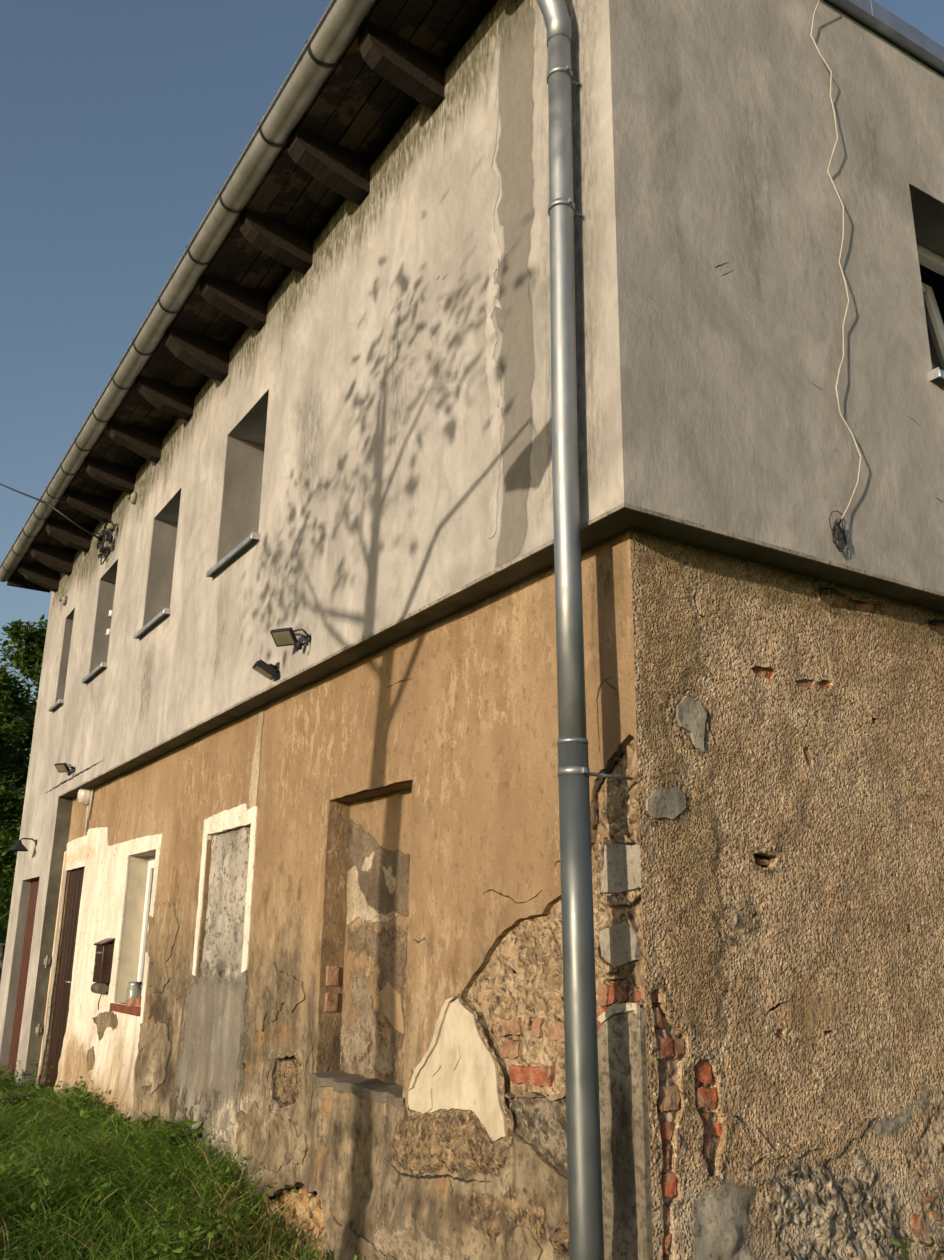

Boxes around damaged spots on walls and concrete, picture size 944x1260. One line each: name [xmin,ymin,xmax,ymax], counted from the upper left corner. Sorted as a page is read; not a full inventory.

peeling [484,88,504,539]
spalling [750,667,775,679]
flaking render [86,1010,118,1072]
flaking render [137,1016,172,1094]
leakage [143,1058,253,1169]
flaking render [236,1052,308,1174]
peeling [340,819,410,1077]
spalling [386,899,568,1176]
spalling [591,738,741,1260]
flaking render [320,1216,455,1260]
peeling [457,1183,546,1260]
spalling [758,1091,944,1260]